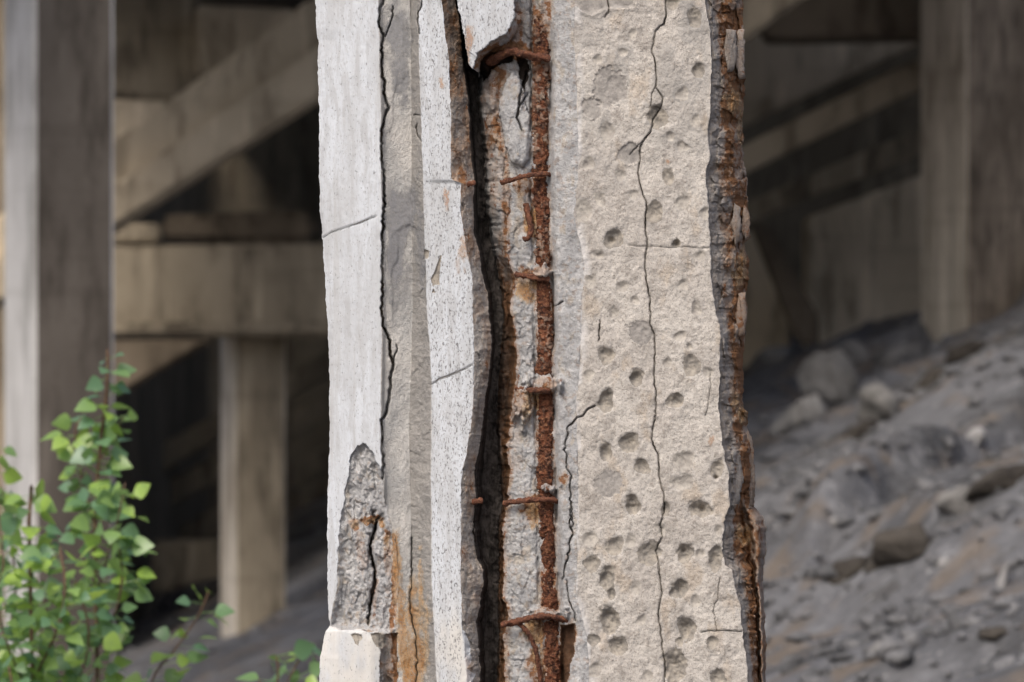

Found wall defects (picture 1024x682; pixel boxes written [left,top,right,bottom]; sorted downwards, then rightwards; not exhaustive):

crack [324,0,528,682]
spalling [477,0,767,682]
spalling [330,443,400,682]
rust [367,518,428,682]
rust [522,620,543,663]
crack [563,406,594,617]